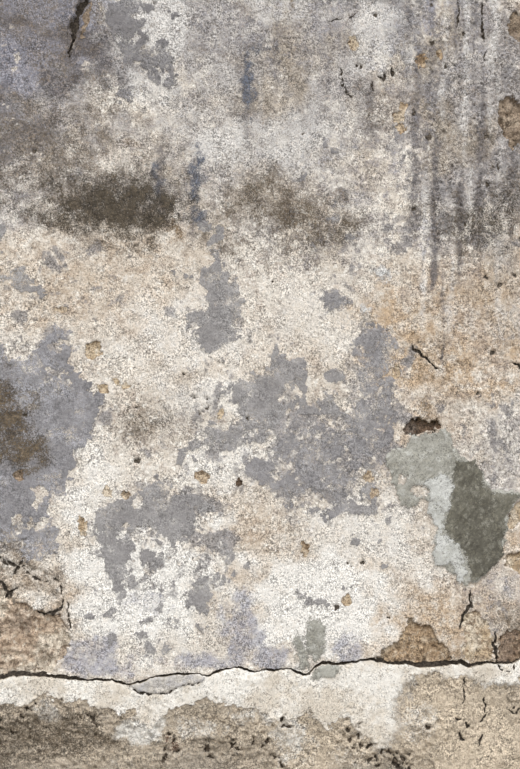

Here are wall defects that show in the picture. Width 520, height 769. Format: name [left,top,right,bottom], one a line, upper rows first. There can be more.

crack [67,0,88,58]
water stain [25,142,205,254]
water stain [235,172,366,253]
crack [412,346,438,369]
water stain [0,379,51,476]
peeling [176,321,441,525]
crack [0,556,71,628]
peeling [184,544,251,633]
flaking render [341,584,354,606]
peeling [0,589,520,769]
crack [0,632,520,746]